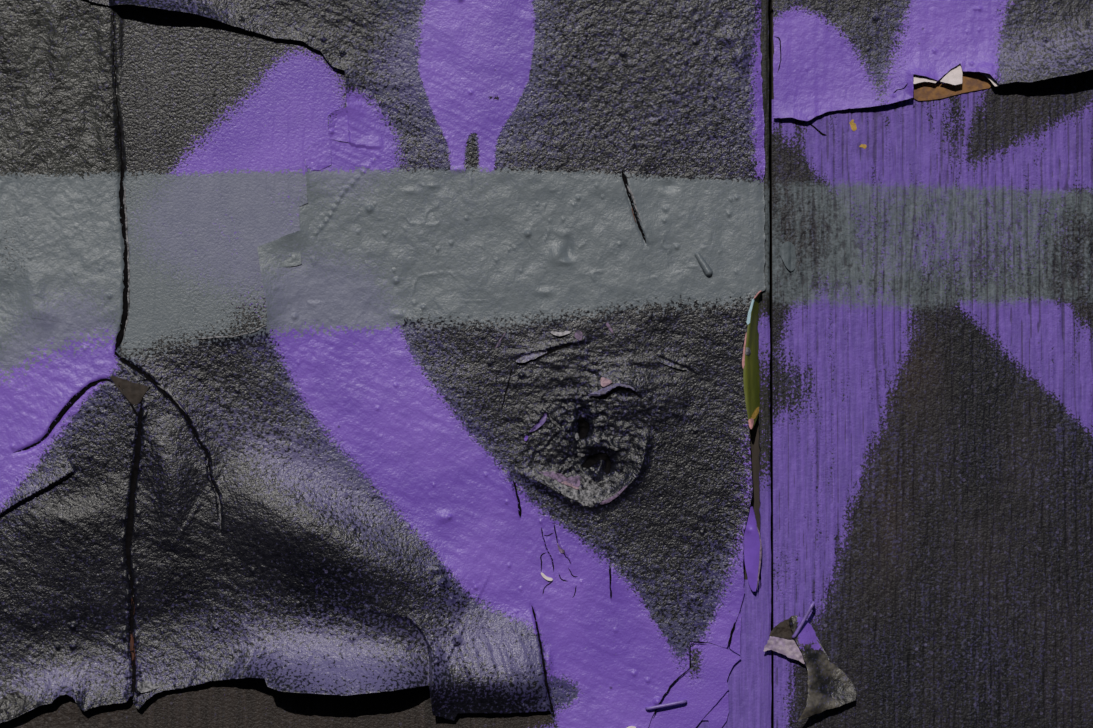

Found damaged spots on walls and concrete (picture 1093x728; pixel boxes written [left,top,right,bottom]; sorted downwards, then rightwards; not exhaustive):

peeling [0,0,349,358]
crack [622,170,646,242]
crack [14,0,221,698]
peeling [501,330,583,411]
peeling [584,371,639,399]
peeling [627,64,1093,728]
crack [0,471,75,516]
spalling [515,413,627,507]
peeling [0,677,556,728]